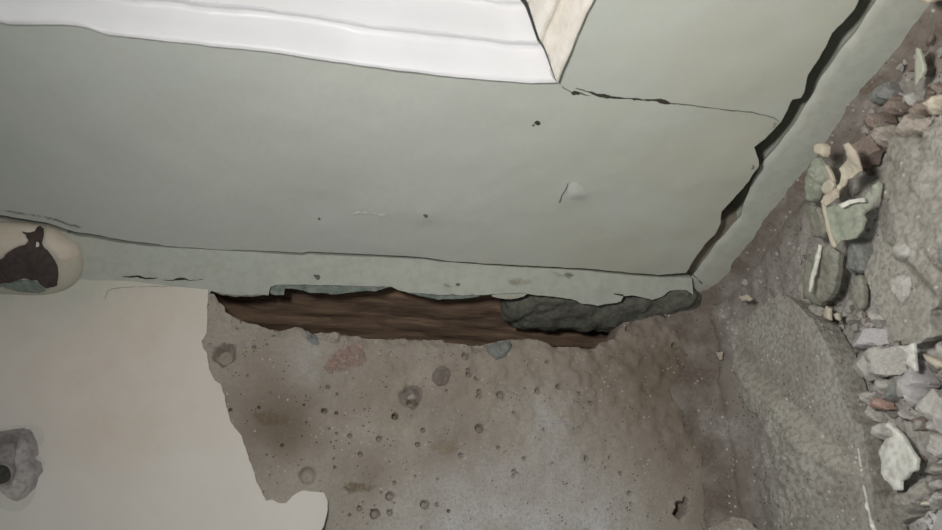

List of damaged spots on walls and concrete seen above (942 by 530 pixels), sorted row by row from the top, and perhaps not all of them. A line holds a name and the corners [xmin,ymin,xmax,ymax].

crack [548,54,779,122]
peeling [0,221,80,294]
spalling [202,275,758,530]